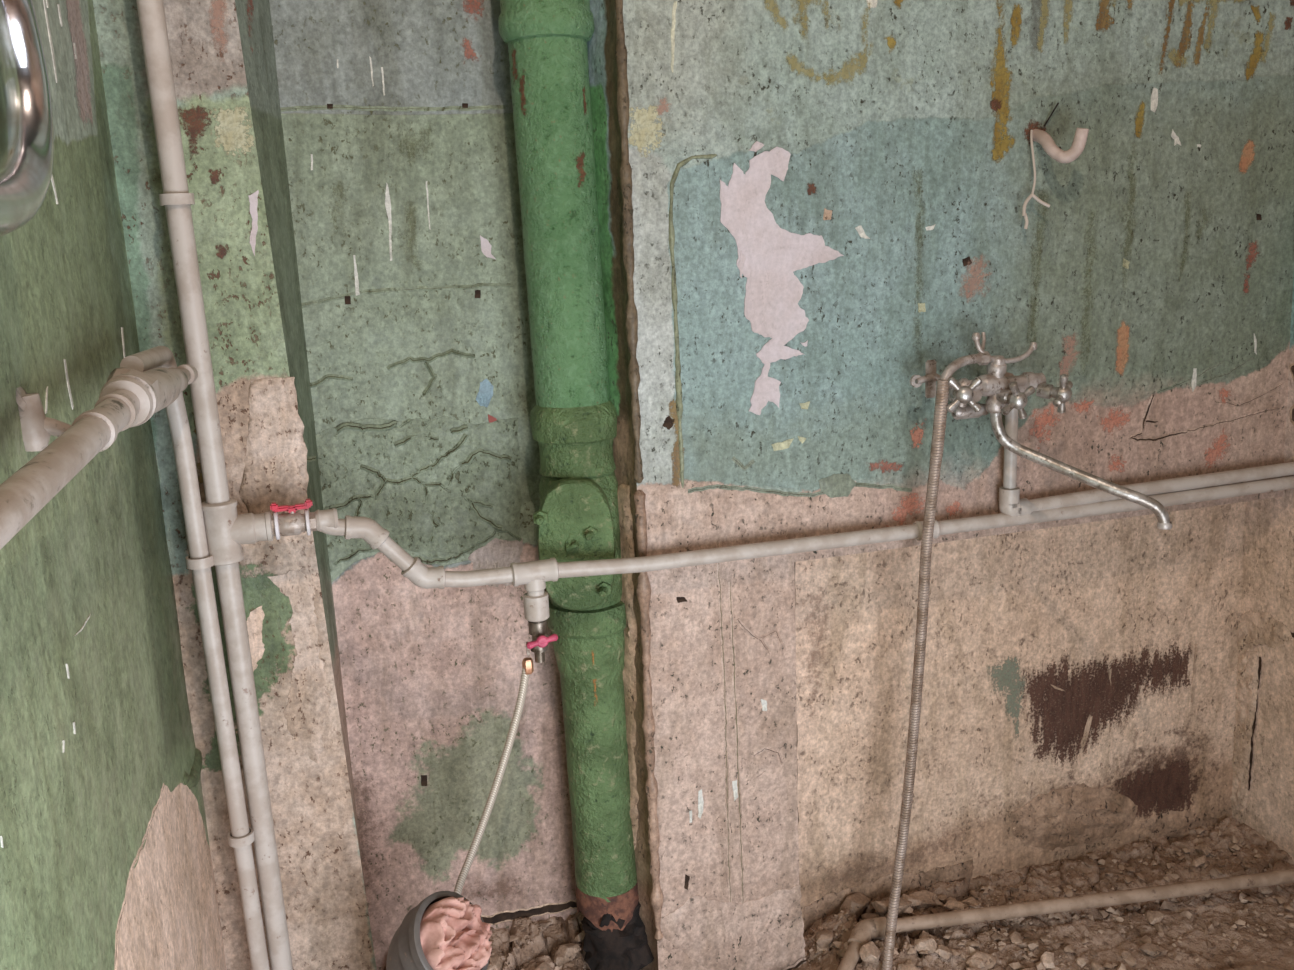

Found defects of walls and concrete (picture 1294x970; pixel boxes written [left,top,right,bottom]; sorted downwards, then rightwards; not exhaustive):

peeling [720,141,844,415]
crack [310,374,353,388]
crack [386,349,475,429]
peeling [772,436,806,451]
peeling [688,474,912,498]
peeling [246,606,265,671]
peeling [267,567,332,764]
water stain [1022,643,1192,787]
crack [1247,631,1294,791]
peeling [114,748,227,970]
spalling [1010,783,1224,851]
water stain [1098,732,1214,817]